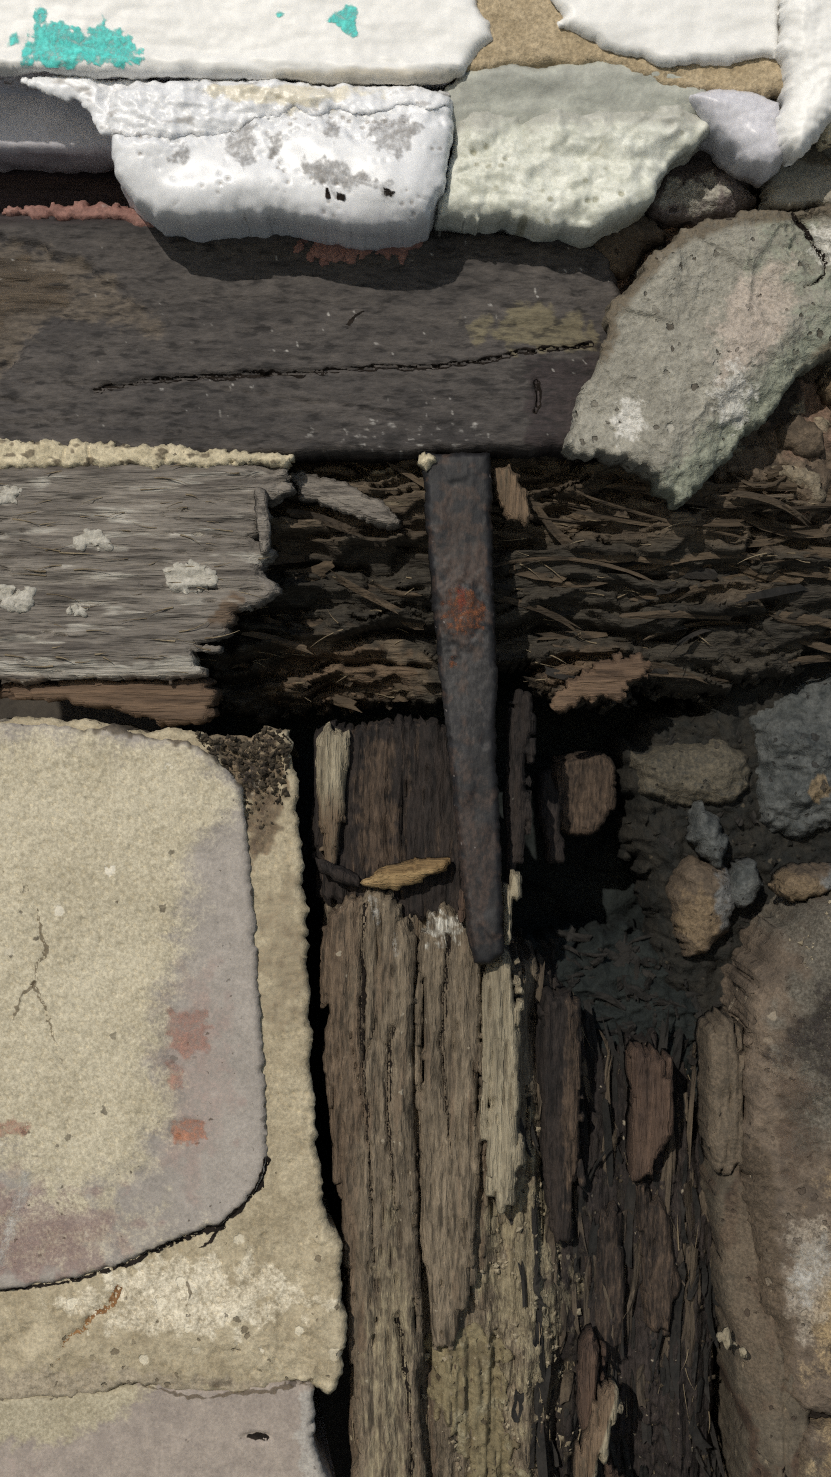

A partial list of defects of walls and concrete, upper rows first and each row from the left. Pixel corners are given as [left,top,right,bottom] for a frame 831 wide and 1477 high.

crack [791,212,828,288]
crack [346,311,364,329]
crack [93,340,594,414]
crack [809,1410,831,1418]